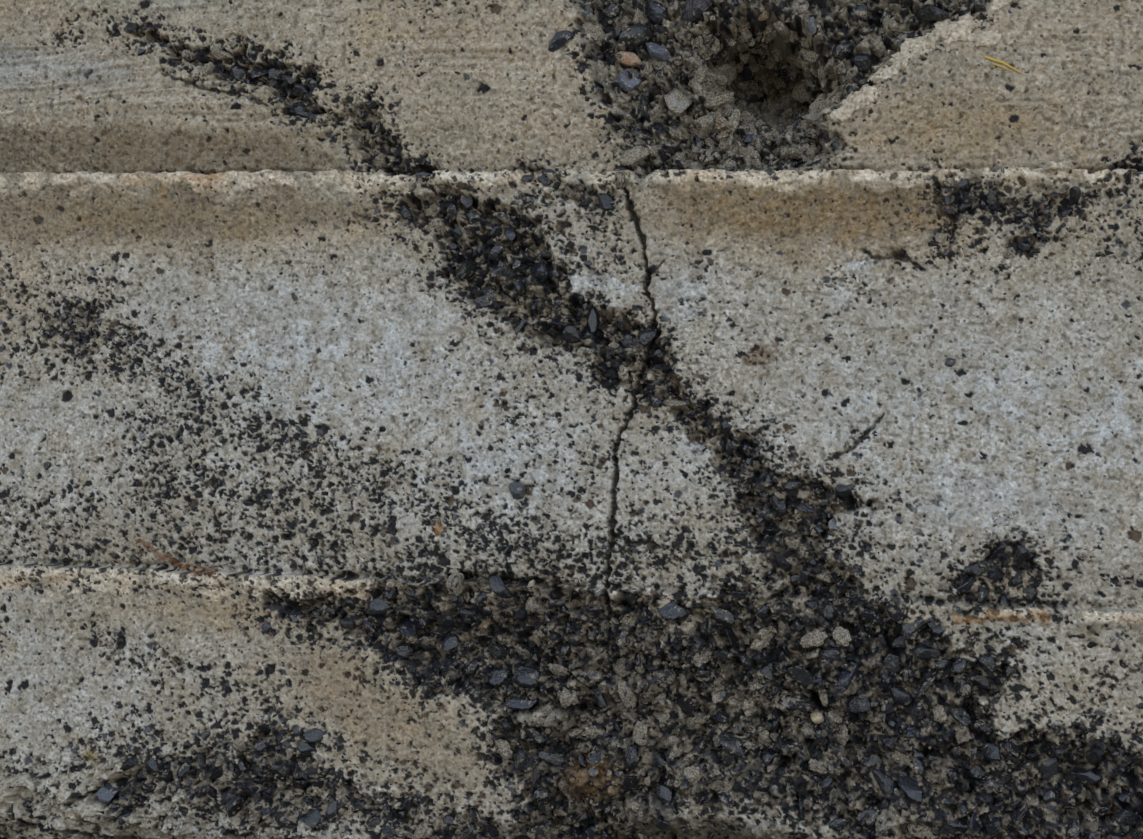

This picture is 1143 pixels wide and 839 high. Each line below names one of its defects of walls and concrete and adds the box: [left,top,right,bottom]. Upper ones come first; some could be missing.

spalling [123,22,438,195]
spalling [517,0,1018,217]
spalling [41,298,124,356]
crack [600,187,663,635]
spalling [263,183,1143,839]
spalling [98,719,501,839]